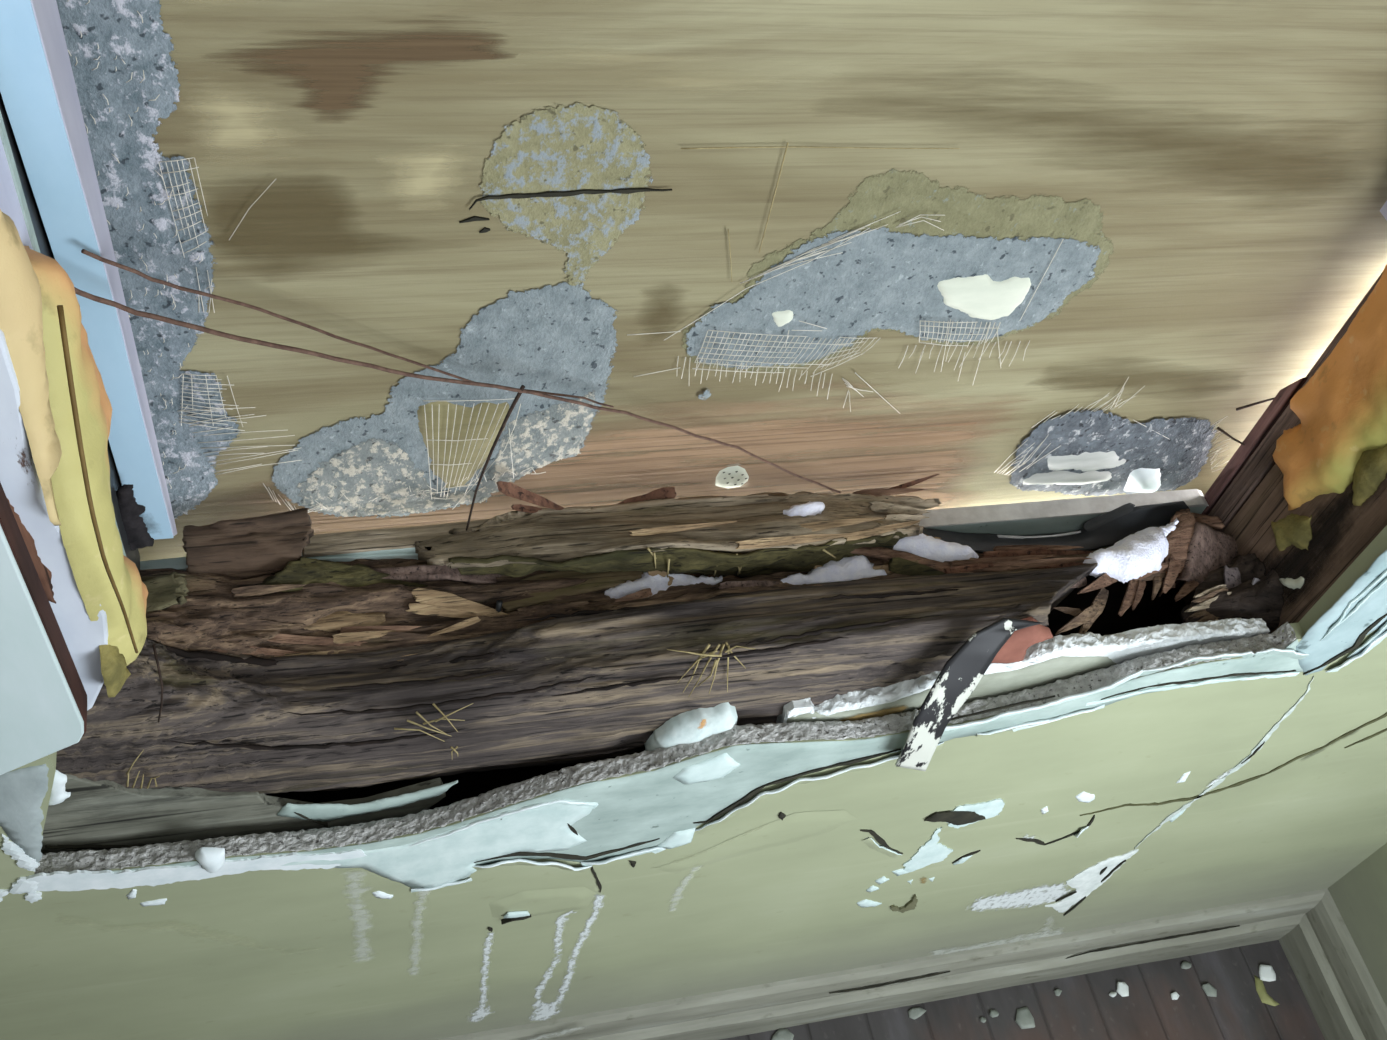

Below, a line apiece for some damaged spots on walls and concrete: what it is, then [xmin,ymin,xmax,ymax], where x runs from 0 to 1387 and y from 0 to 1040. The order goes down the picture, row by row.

peeling [198,102,271,146]
water stain [230,33,504,114]
peeling [935,550,1387,751]
peeling [0,671,941,907]
peeling [1075,791,1095,803]
crack [1016,675,1387,849]
peeling [857,798,1005,913]
crack [952,850,981,865]
water stain [471,933,493,1022]
water stain [529,896,604,1040]